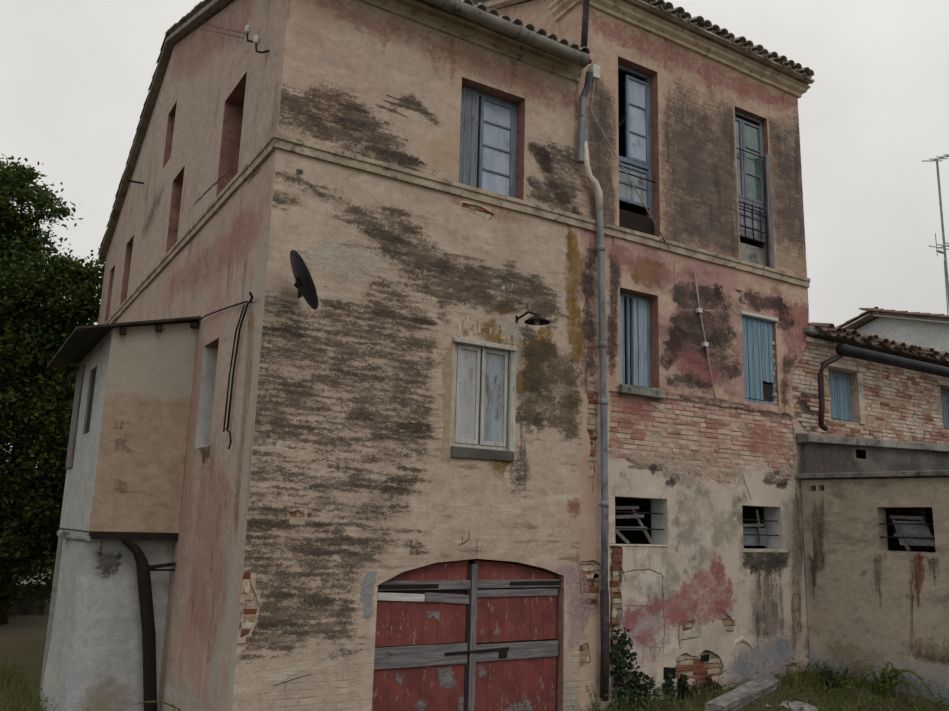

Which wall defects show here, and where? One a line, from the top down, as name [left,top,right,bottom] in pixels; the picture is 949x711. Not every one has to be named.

damp [279,83,440,172]
damp [526,81,616,224]
damp [238,172,620,663]
spalling [587,382,797,491]
damp [659,283,858,480]
damp [764,470,800,510]
damp [94,540,122,578]
spalling [240,568,272,639]
peeling [579,546,736,668]
corrosion [913,553,925,607]
spalling [652,650,748,702]